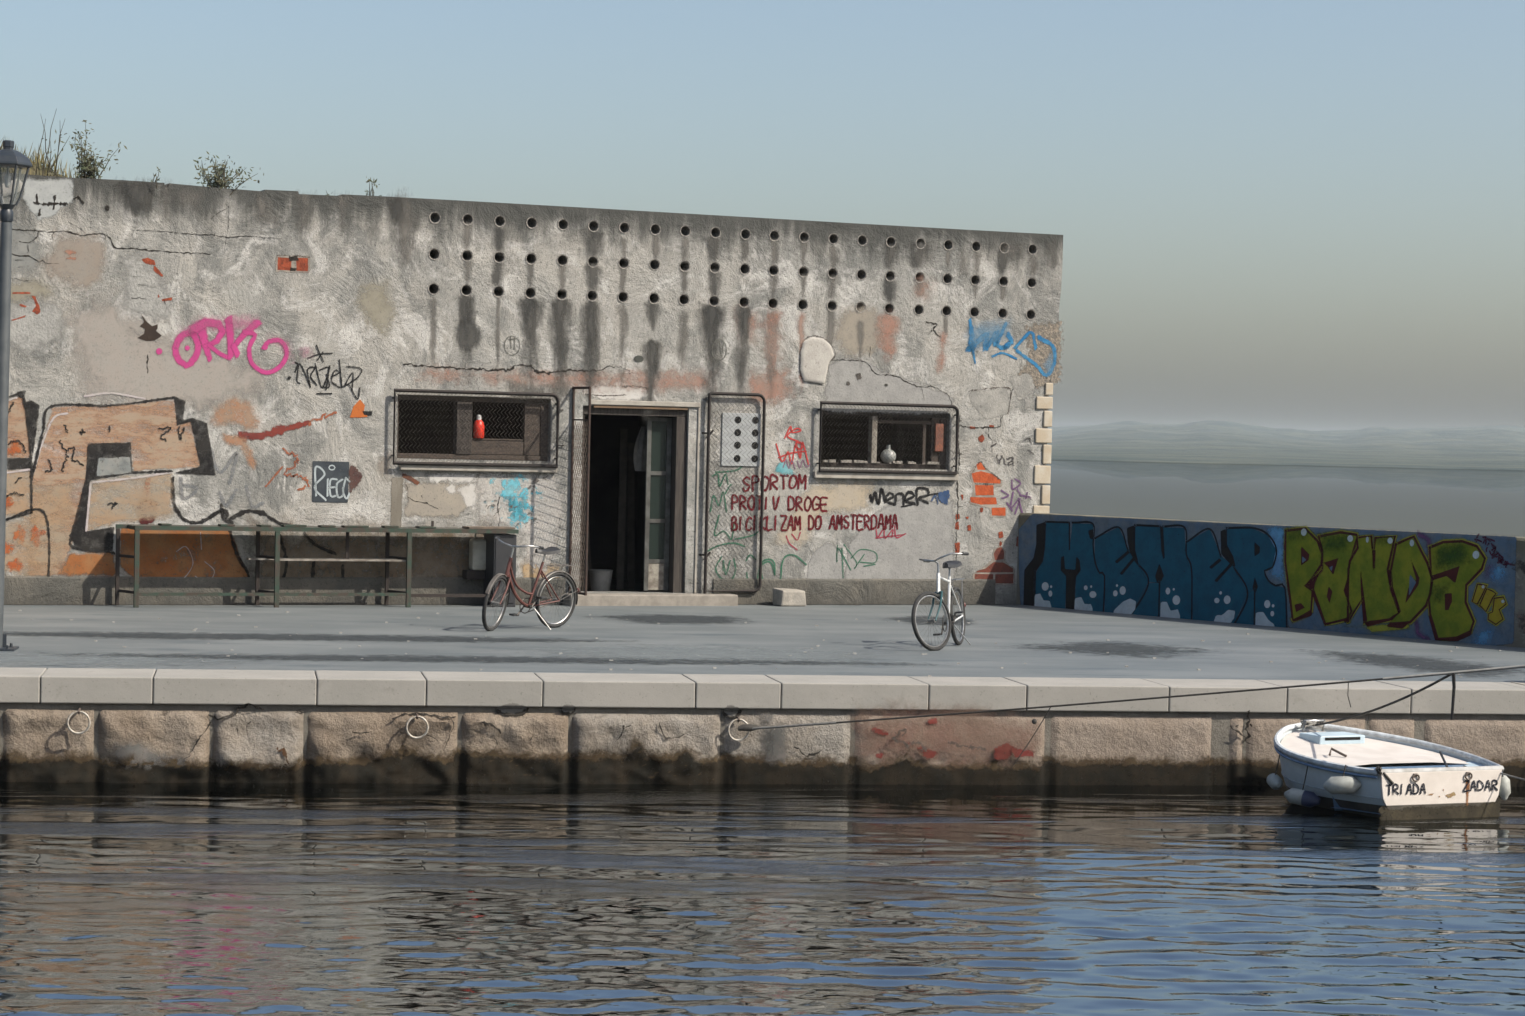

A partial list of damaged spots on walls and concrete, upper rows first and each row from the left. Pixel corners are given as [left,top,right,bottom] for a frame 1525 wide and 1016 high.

water stain [457,223,505,359]
water stain [509,231,603,399]
water stain [618,239,628,359]
water stain [644,303,661,407]
water stain [679,237,778,392]
water stain [827,246,838,345]
flaking render [824,308,954,415]
water stain [858,242,929,354]
water stain [998,245,1057,299]
flaking render [1017,320,1064,389]
flaking render [778,461,1018,585]
water stain [112,743,185,768]